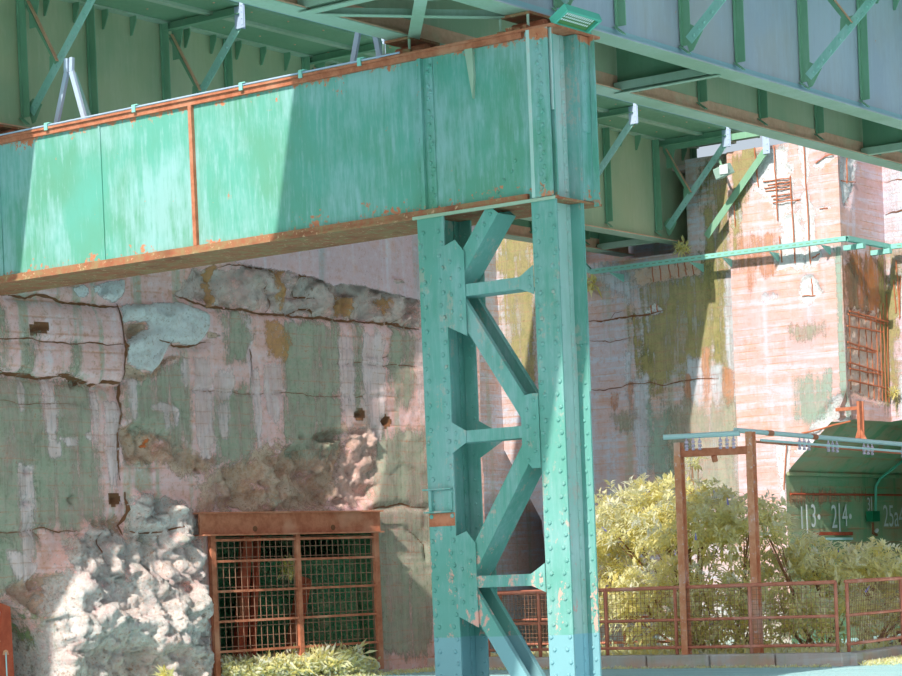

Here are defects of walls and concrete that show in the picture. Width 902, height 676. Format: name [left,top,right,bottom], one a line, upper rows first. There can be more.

spalling [752,144,857,305]
water stain [39,380,62,459]
spalling [123,356,175,381]
crack [159,339,205,348]
crack [175,264,419,330]
crack [589,310,664,343]
water stain [625,314,653,492]
crack [594,378,714,391]
water stain [687,258,736,405]
spalling [775,260,902,498]
corrosion [842,246,884,345]
water stain [6,463,37,582]